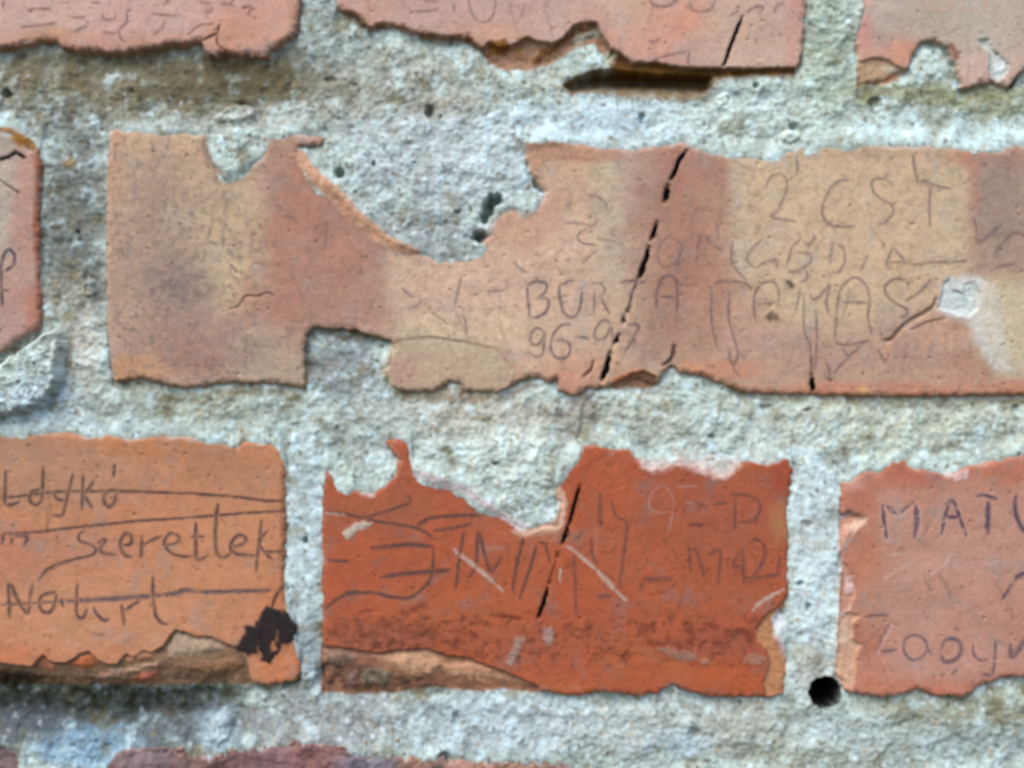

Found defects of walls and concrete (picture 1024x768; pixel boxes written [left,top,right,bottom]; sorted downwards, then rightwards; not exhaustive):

spalling [482,20,738,72]
crack [722,18,744,67]
spalling [855,39,963,79]
spalling [975,34,1013,80]
spalling [199,126,268,181]
spalling [292,117,605,259]
crack [577,151,688,438]
spalling [412,434,579,539]
crack [537,486,581,618]
spalling [1,628,251,676]
spalling [358,650,540,694]